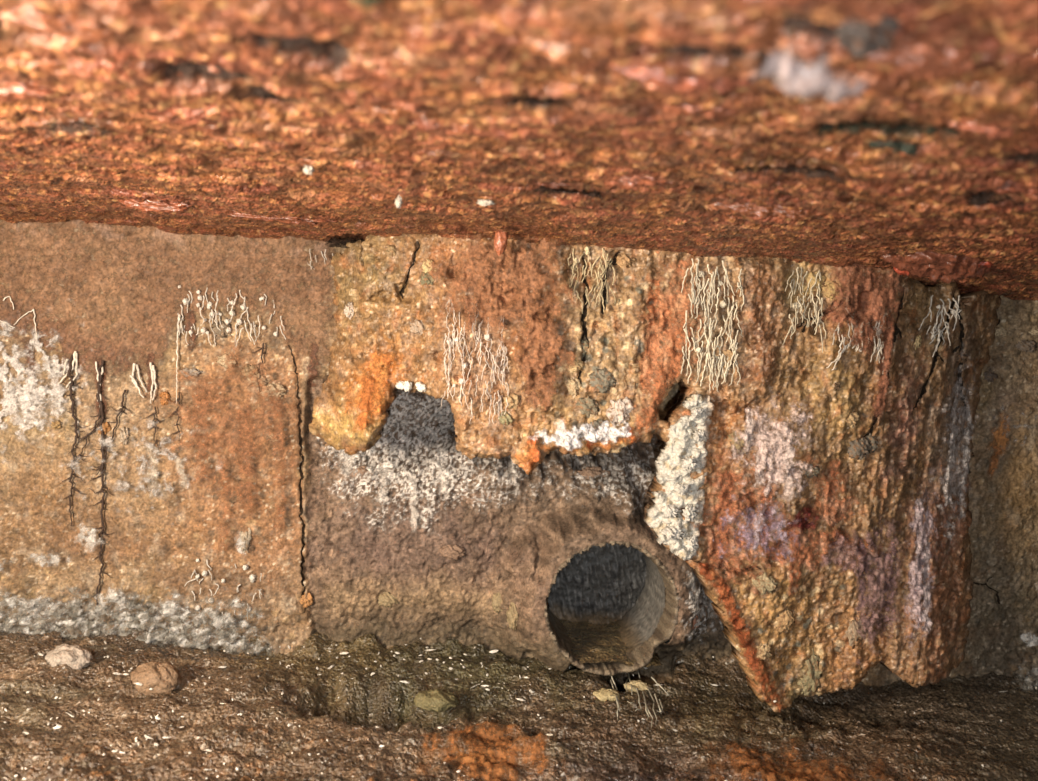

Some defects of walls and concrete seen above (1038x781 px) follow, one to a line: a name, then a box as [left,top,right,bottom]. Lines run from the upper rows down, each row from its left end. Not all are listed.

rust [0,3,142,43]
rust [522,35,753,121]
rust [117,198,193,213]
damp [0,220,335,508]
rust [575,259,715,453]
damp [78,528,100,551]
damp [0,587,275,656]
crack [288,345,306,613]
spalling [305,379,731,677]
damp [317,380,724,640]
damp [721,400,812,558]
rust [694,451,897,710]